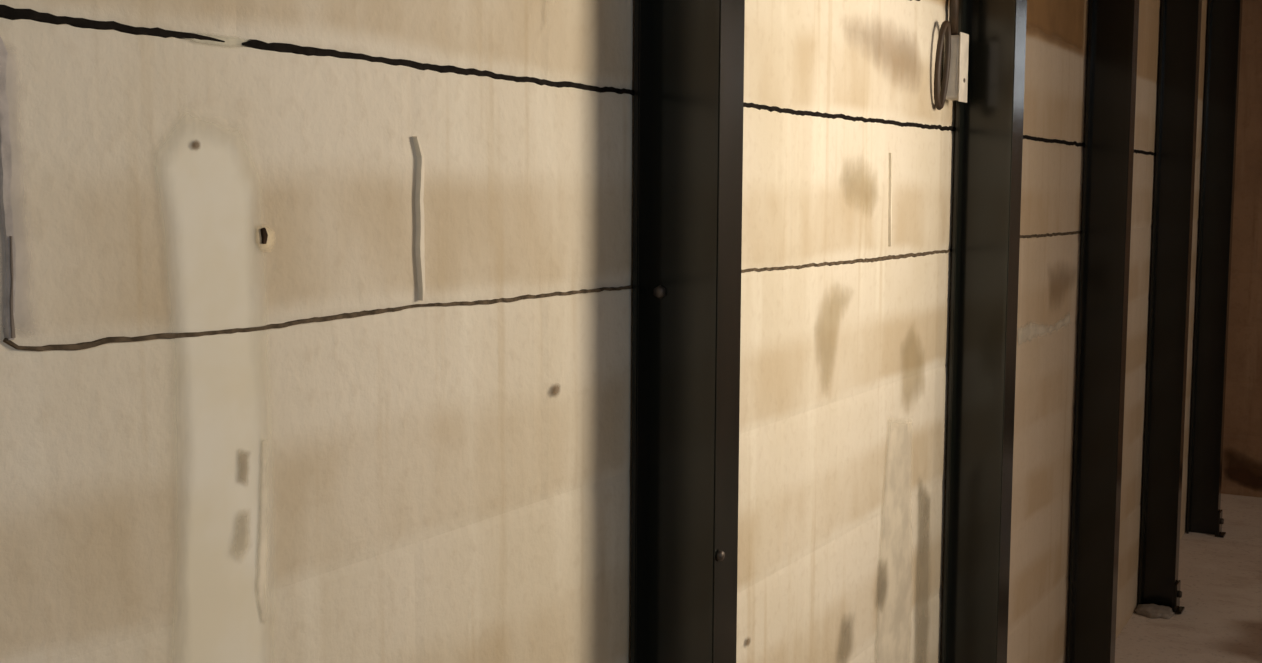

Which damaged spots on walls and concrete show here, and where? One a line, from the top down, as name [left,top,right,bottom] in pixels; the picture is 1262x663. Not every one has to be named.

crack [743,102,955,132]
crack [1023,135,1085,147]
crack [1134,148,1156,156]
crack [0,4,634,351]
crack [1020,230,1082,238]
crack [741,249,952,273]
water stain [1225,451,1262,489]